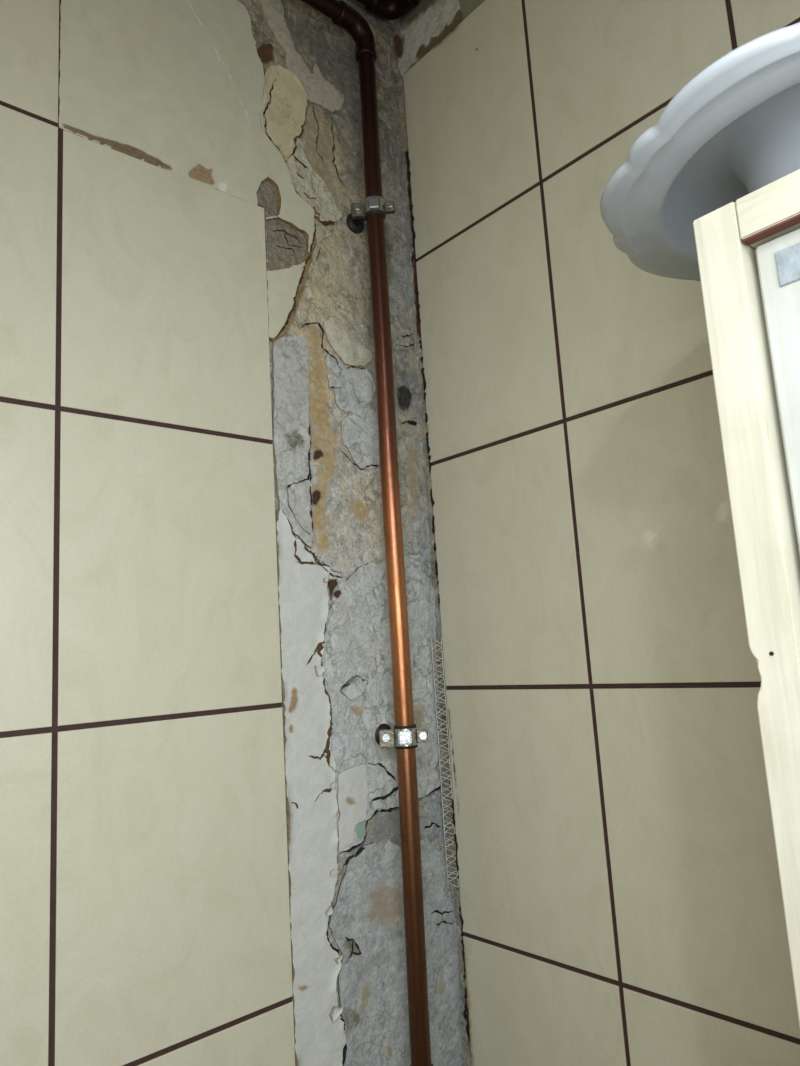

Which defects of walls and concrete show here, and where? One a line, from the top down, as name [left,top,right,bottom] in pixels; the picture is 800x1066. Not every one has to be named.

peeling [398,0,460,78]
crack [187,0,365,389]
crack [400,137,440,604]
peeling [58,0,412,1066]
crack [282,424,343,578]
crack [292,606,365,808]
crack [339,1015,347,1066]
crack [326,902,361,963]
crack [341,763,399,867]
flaking render [404,555,441,798]
flaking render [420,838,462,1066]
crack [424,786,470,1043]